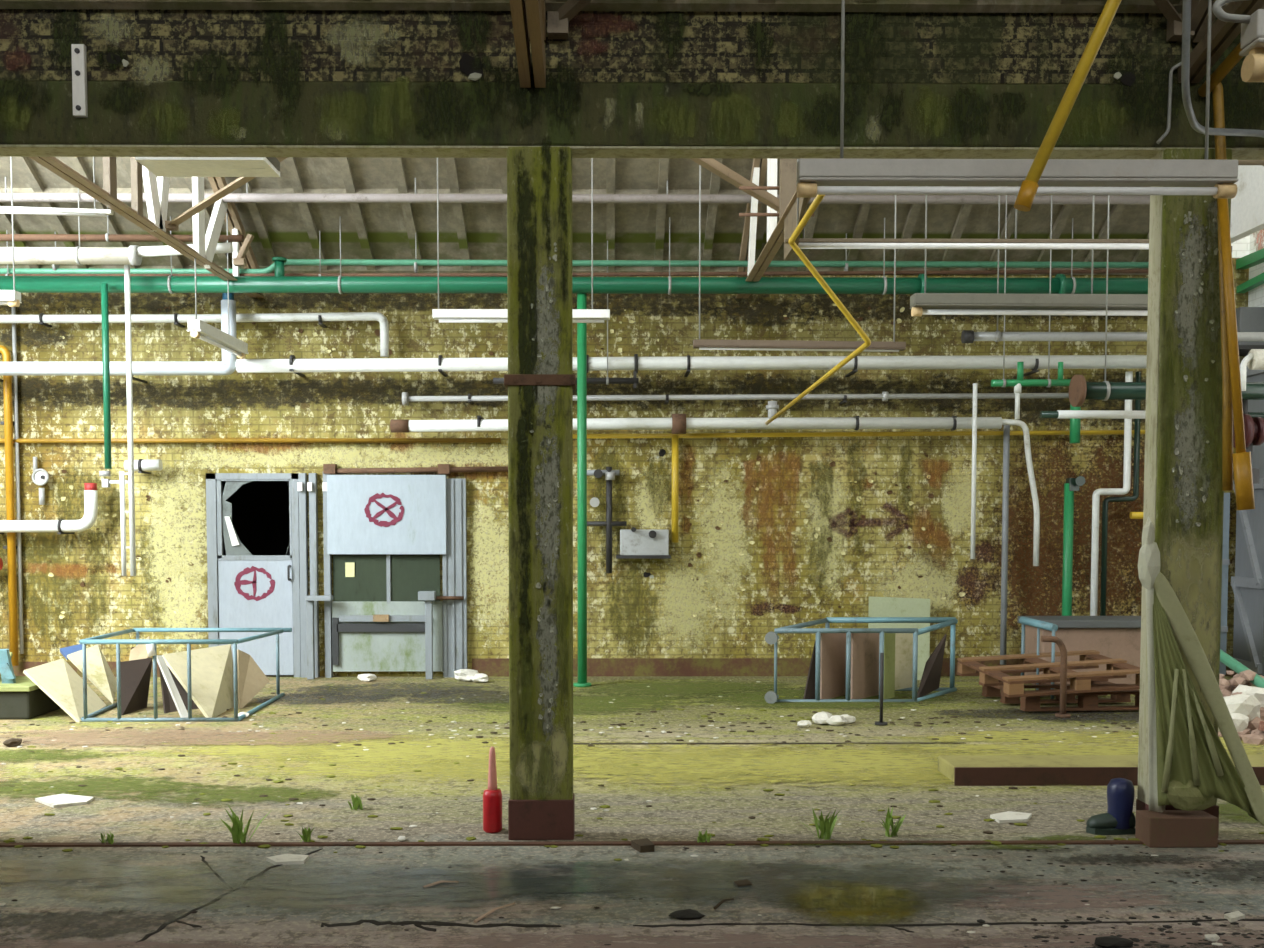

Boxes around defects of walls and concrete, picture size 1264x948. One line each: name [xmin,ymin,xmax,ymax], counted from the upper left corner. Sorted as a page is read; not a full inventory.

water stain [248,10,304,120]
water stain [656,12,760,146]
water stain [778,12,948,142]
water stain [573,371,1146,426]
water stain [1195,212,1221,494]
water stain [0,136,913,801]
corrosion [743,453,800,594]
corrosion [907,510,952,570]
crack [135,848,323,943]
water stain [0,858,1034,913]